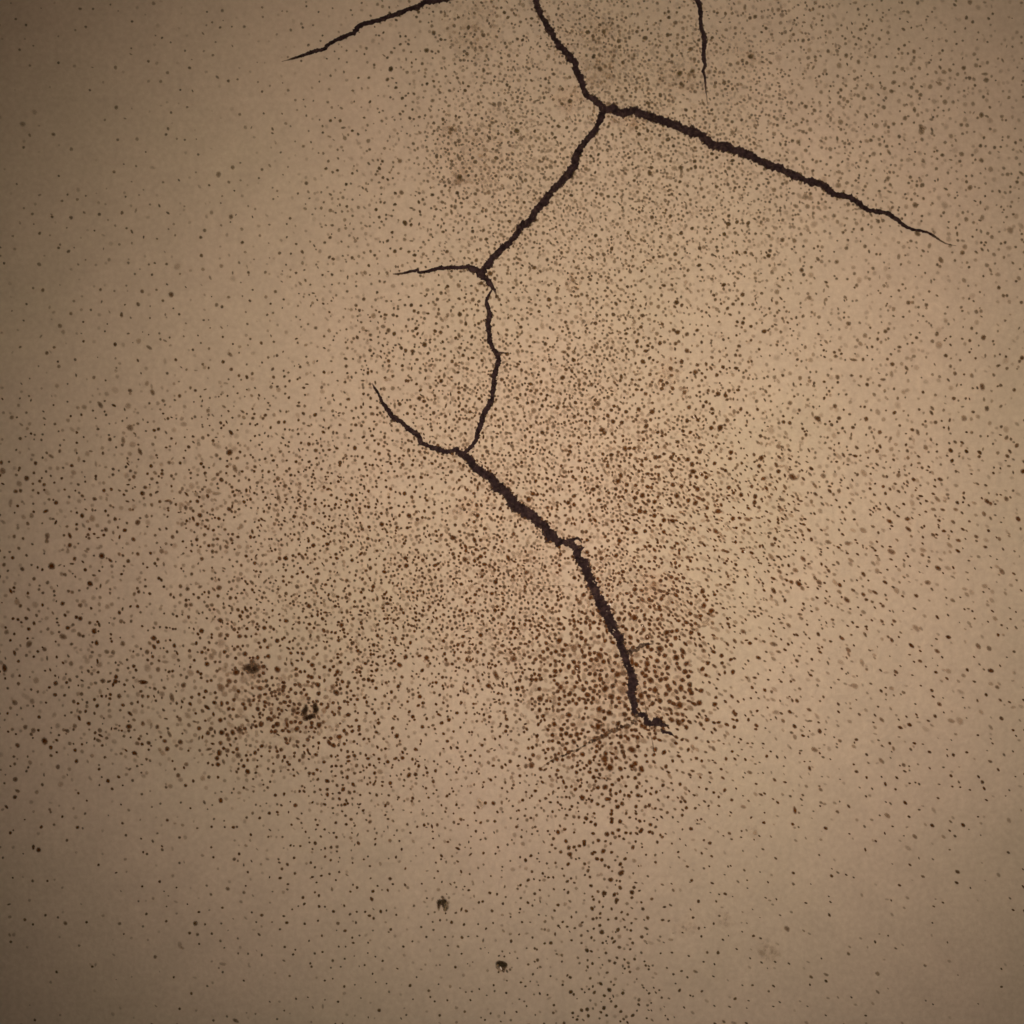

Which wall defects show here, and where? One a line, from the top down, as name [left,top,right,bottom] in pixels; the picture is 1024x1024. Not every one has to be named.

crack [281,0,455,64]
crack [370,0,957,768]